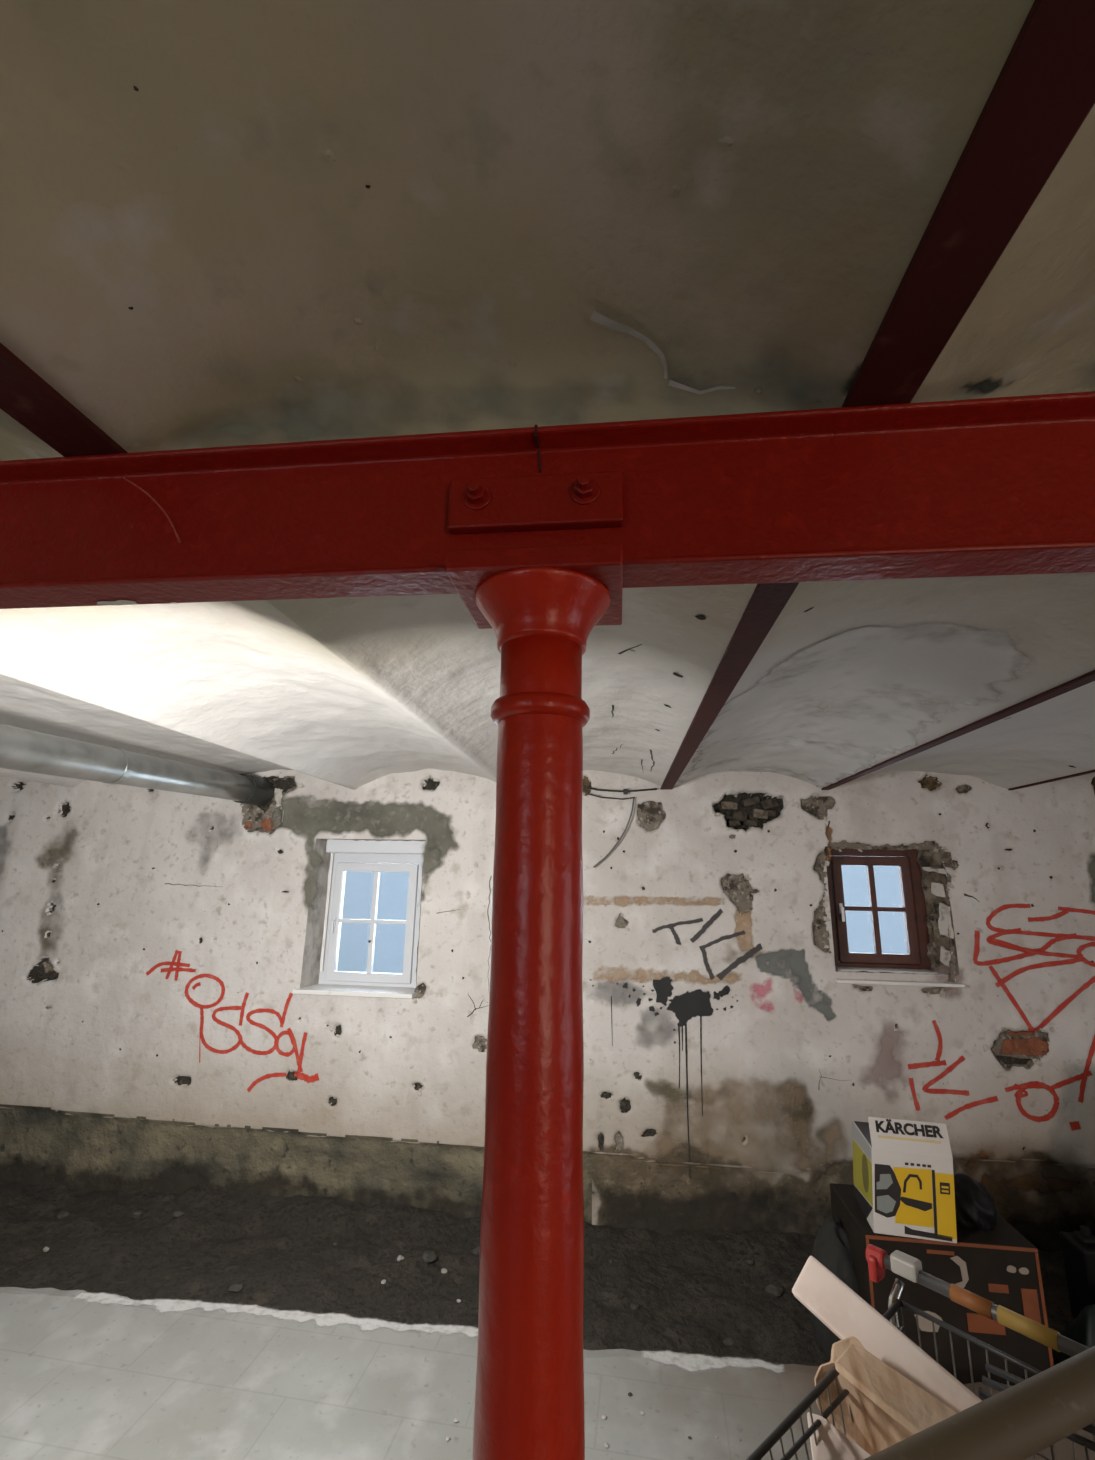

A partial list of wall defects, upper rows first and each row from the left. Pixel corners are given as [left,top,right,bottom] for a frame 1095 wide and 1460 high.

damp [965,379,1012,394]
spalling [240,772,305,854]
flaking render [420,775,440,790]
spalling [713,792,784,853]
flaking render [588,873,777,951]
flaking render [809,840,960,998]
flaking render [983,1026,1055,1071]
damp [633,1081,829,1195]